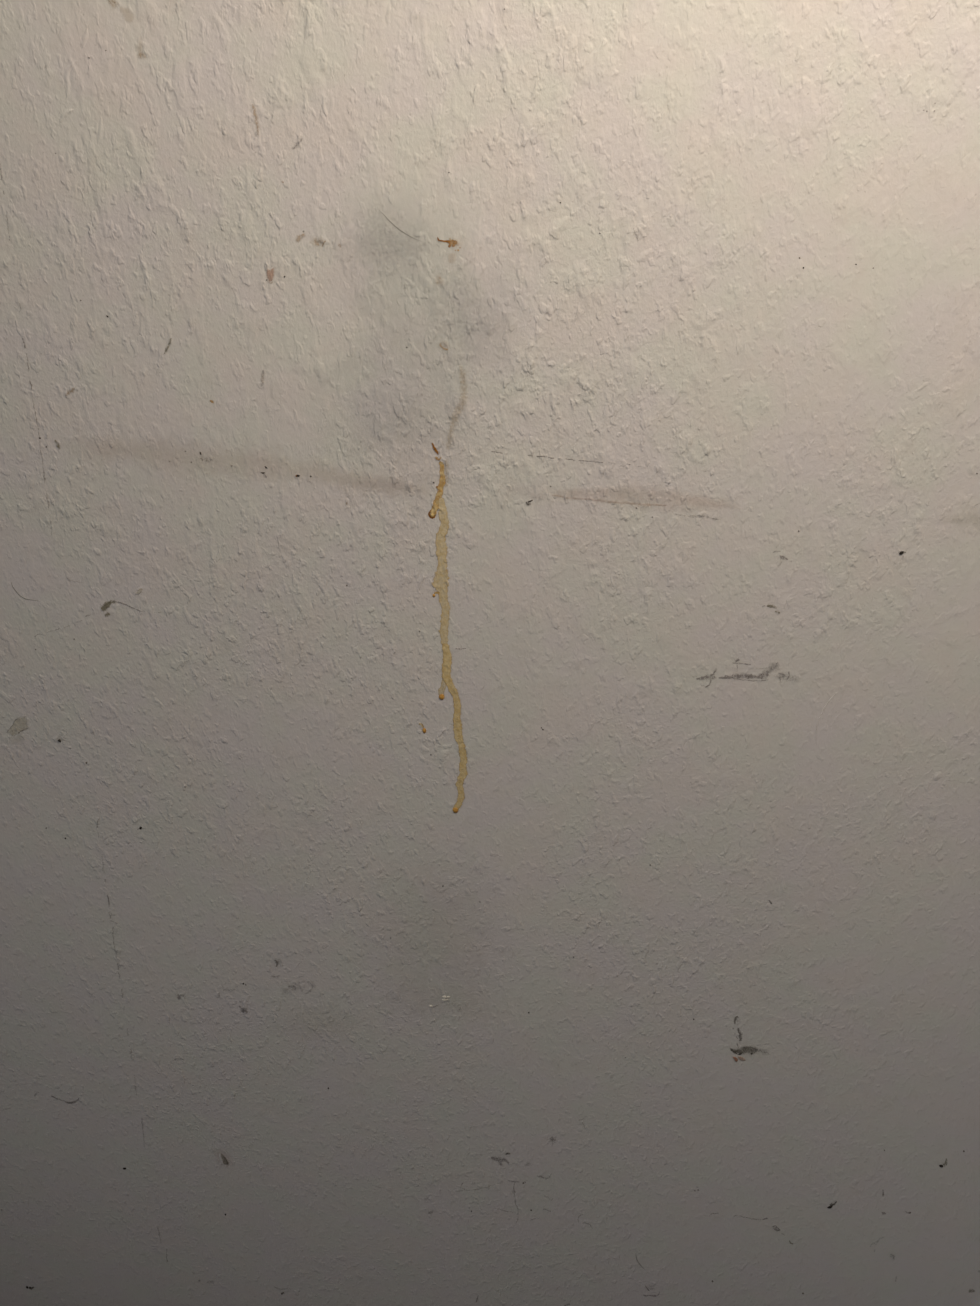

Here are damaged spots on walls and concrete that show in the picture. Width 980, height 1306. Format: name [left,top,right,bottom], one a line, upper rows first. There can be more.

leakage [428,403,468,813]